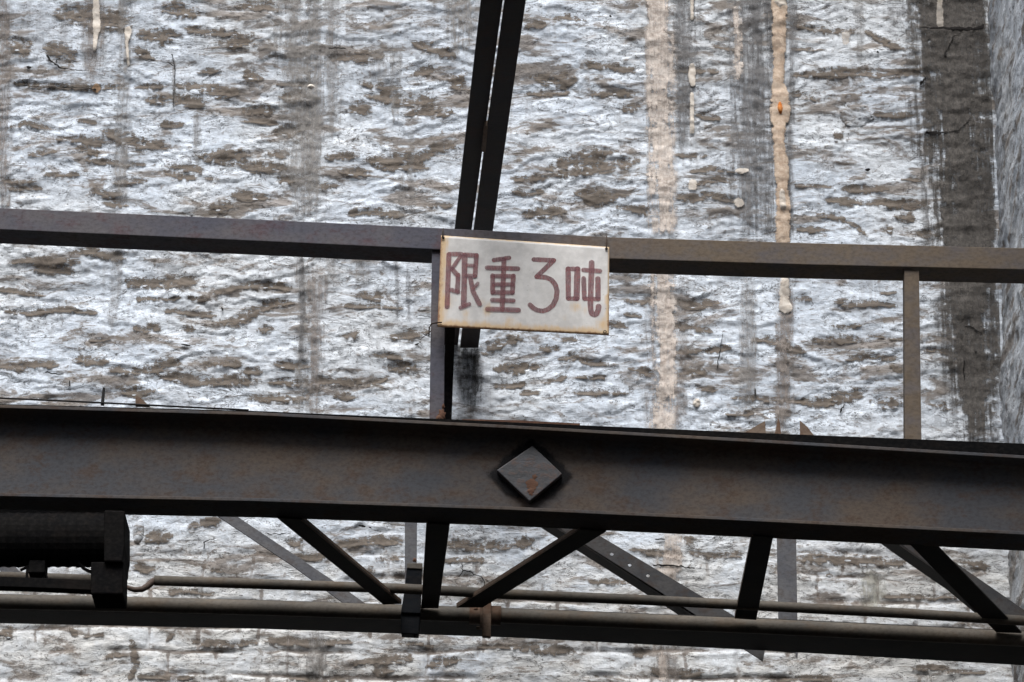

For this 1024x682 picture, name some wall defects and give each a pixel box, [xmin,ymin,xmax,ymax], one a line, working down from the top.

water stain [645,0,701,234]
water stain [897,0,997,247]
crack [920,24,984,56]
water stain [469,349,480,388]
water stain [646,274,687,429]
water stain [934,282,1001,442]